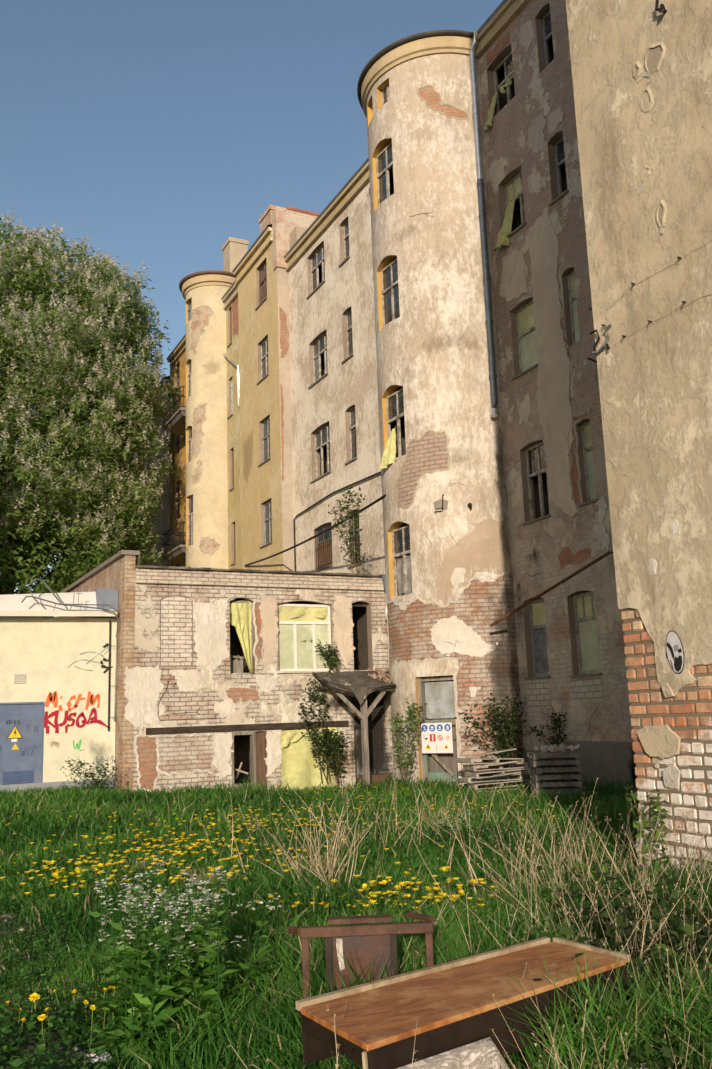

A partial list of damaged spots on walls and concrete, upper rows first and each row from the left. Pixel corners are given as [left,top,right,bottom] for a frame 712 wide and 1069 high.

spalling [417,85,469,121]
crack [556,206,581,409]
peeling [499,207,611,569]
spalling [395,429,450,509]
spalling [124,599,234,791]
peeling [211,595,280,719]
peeling [264,732,282,777]
spalling [387,515,524,781]
peeling [637,725,681,789]